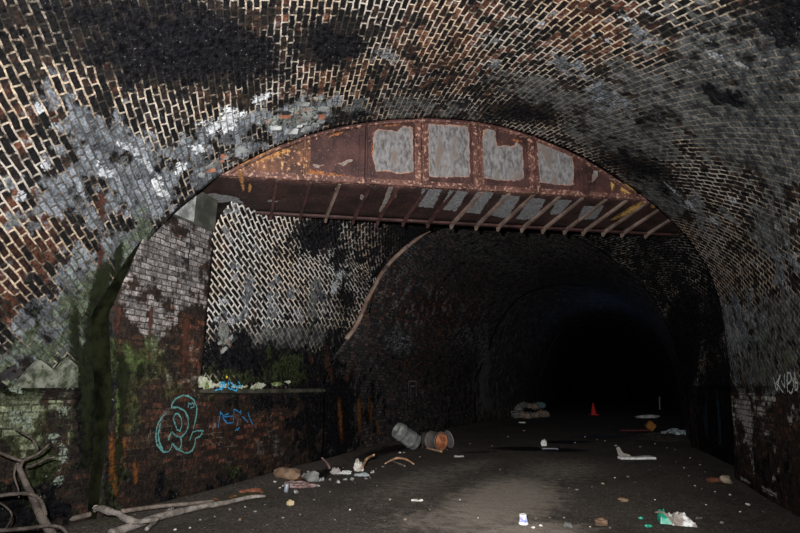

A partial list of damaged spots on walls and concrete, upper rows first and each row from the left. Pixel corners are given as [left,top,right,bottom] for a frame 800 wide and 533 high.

efflorescence [198,105,247,134]
efflorescence [116,141,170,198]
corrosion [236,149,289,193]
peeling [372,126,414,174]
peeling [428,124,471,178]
peeling [482,129,524,182]
peeling [537,143,574,186]
corrosion [611,202,656,220]